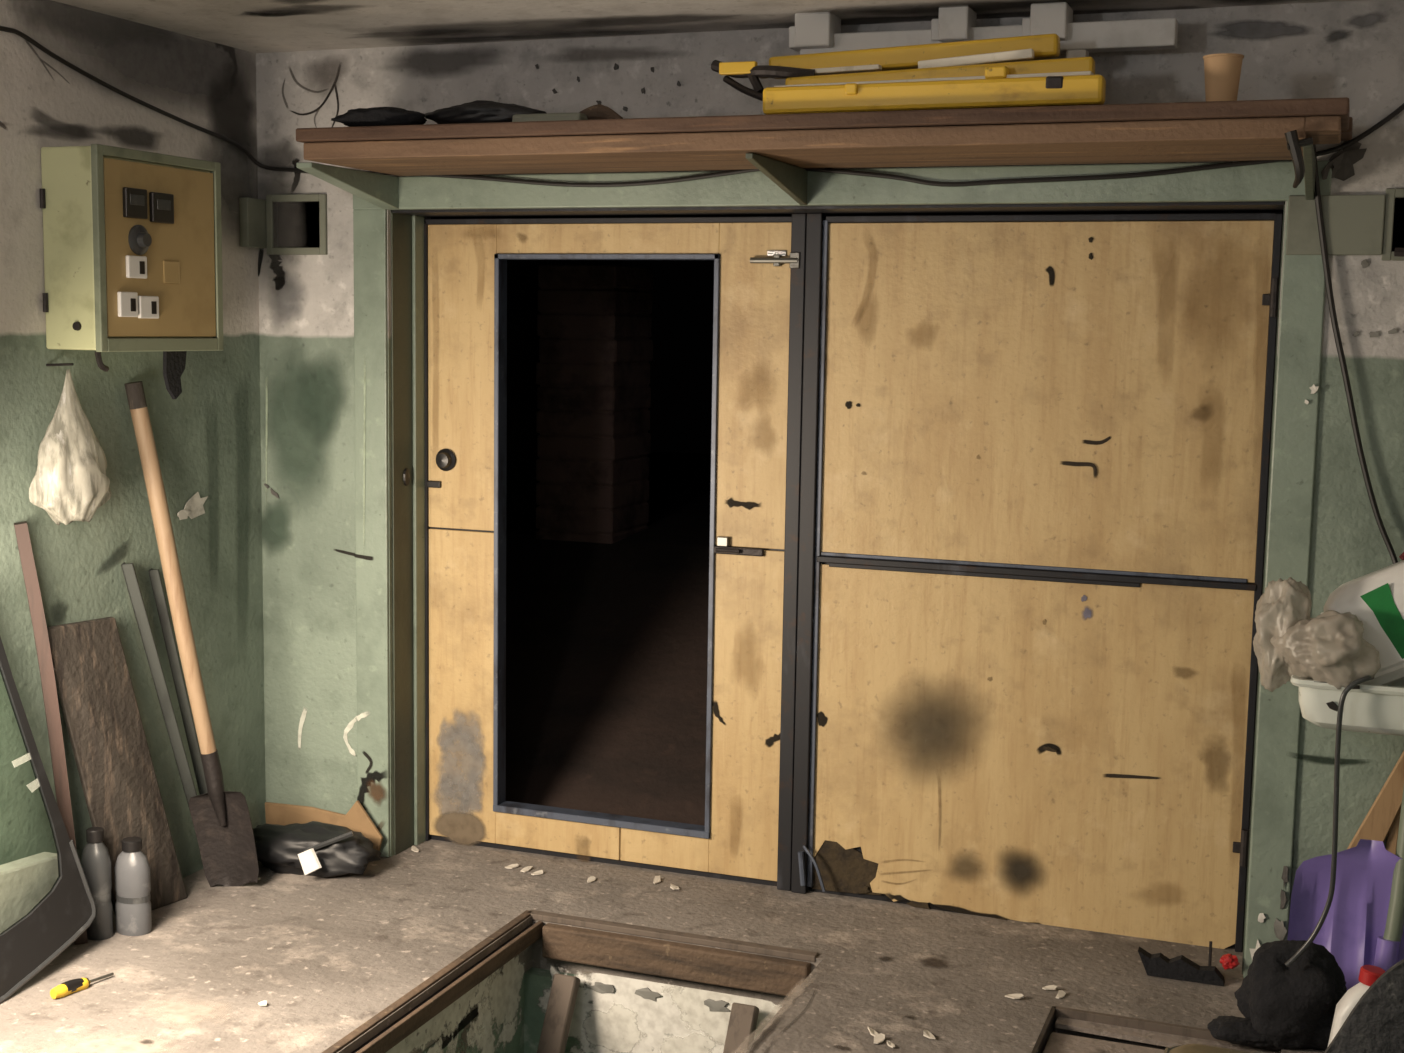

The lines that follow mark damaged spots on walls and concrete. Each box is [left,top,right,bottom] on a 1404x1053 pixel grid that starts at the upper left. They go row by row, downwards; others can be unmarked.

damp [34,0,300,276]
damp [276,279,297,317]
damp [266,368,339,490]
damp [262,508,286,547]
peeling [386,955,806,1053]